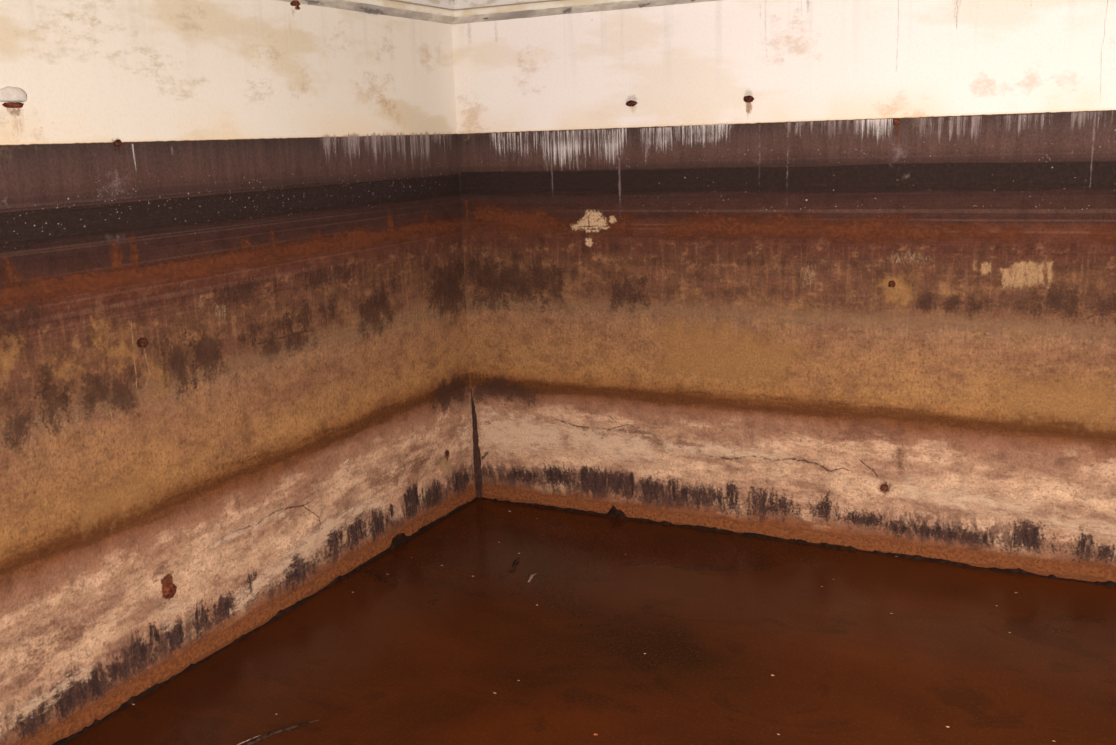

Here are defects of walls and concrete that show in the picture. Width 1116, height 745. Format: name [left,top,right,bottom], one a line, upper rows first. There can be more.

water stain [642,123,728,149]
water stain [828,119,893,139]
water stain [0,128,1116,245]
peeling [571,210,617,247]
corrosion [605,215,634,233]
peeling [973,261,1054,289]
water stain [1,456,1116,738]
corrosion [21,485,1116,745]